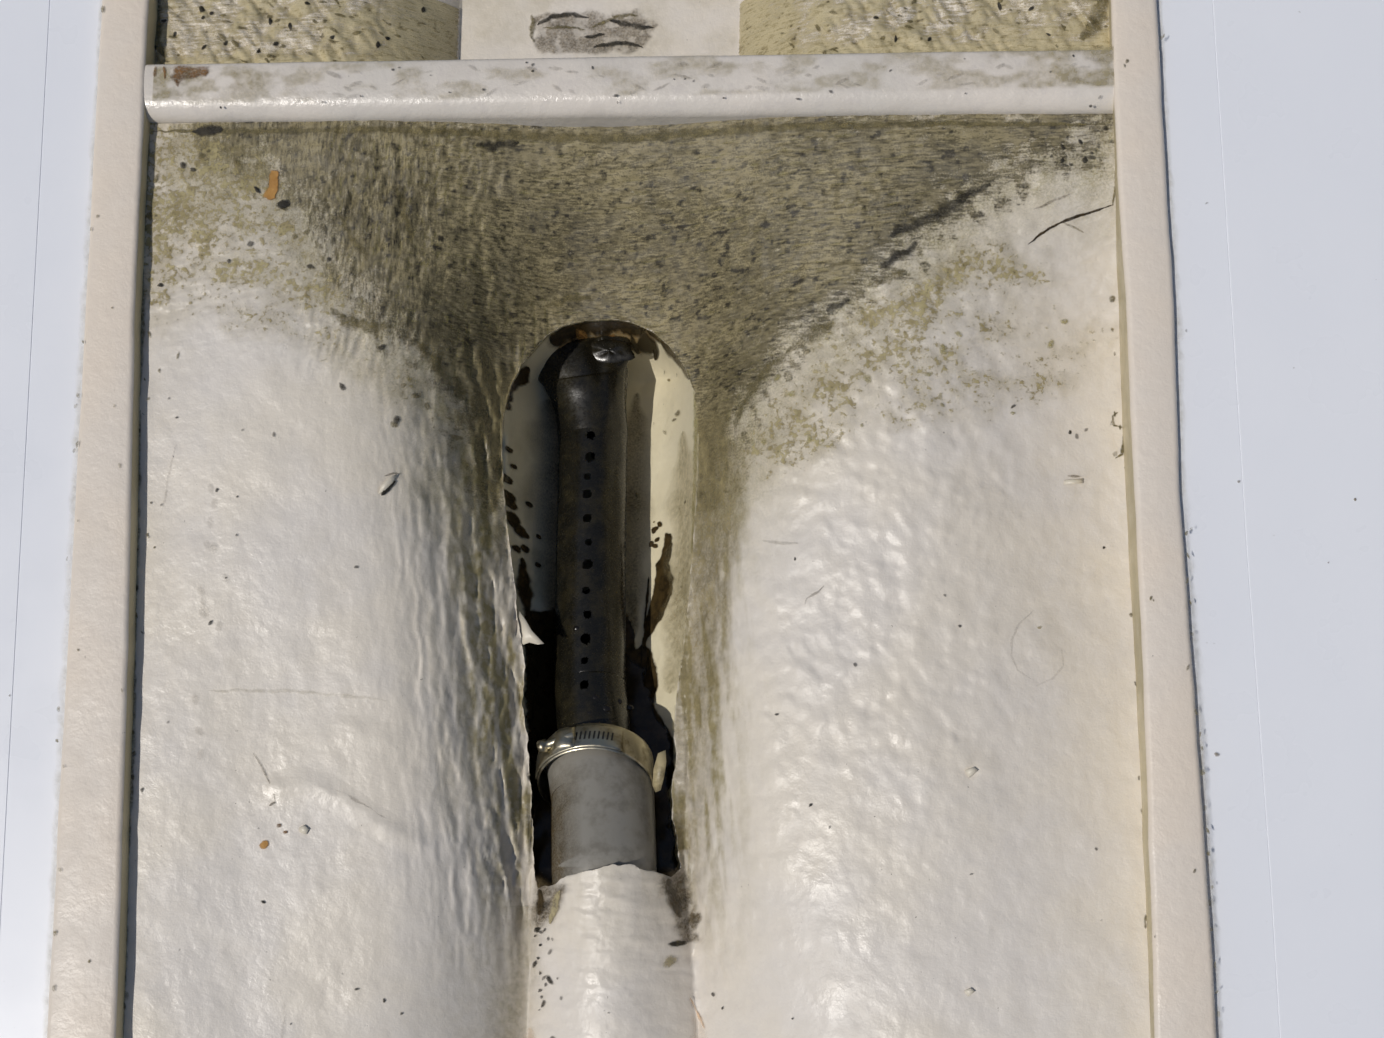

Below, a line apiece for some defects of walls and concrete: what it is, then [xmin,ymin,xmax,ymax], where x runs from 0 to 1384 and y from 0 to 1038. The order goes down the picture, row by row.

rust [254,170,289,209]
peeling [506,366,530,410]
water stain [141,114,1114,731]
water stain [129,660,143,847]
peeling [503,446,555,724]
peeling [626,522,675,792]